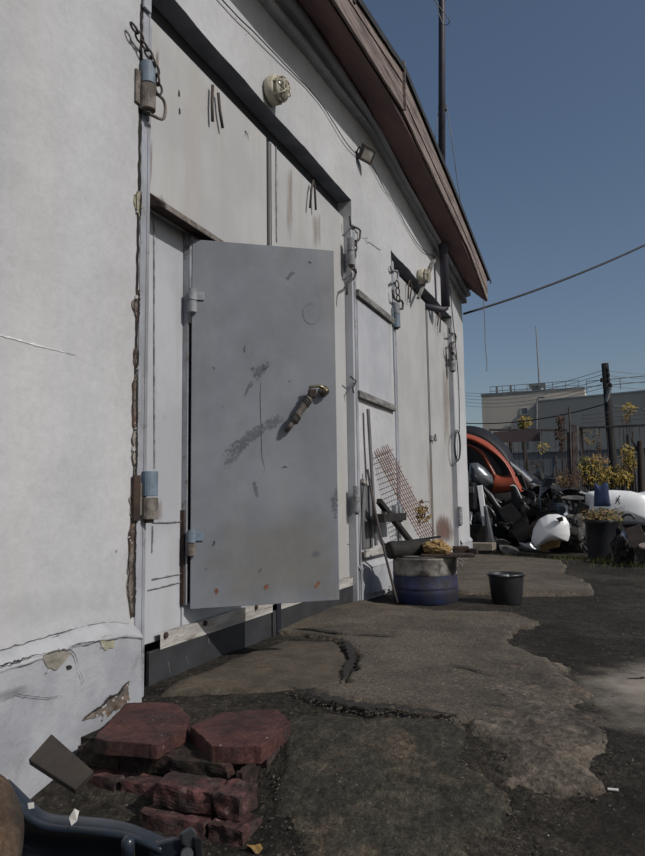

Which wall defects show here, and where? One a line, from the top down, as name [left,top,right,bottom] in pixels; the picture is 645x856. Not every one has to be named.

crack [137,4,145,71]
crack [136,109,144,192]
crack [134,213,142,294]
flaking render [131,289,141,322]
crack [132,320,140,377]
flaking render [131,348,140,475]
peeling [225,417,283,463]
flaking render [126,488,137,619]
flaking render [43,648,72,673]
crack [0,622,125,701]
flaking render [82,681,130,721]